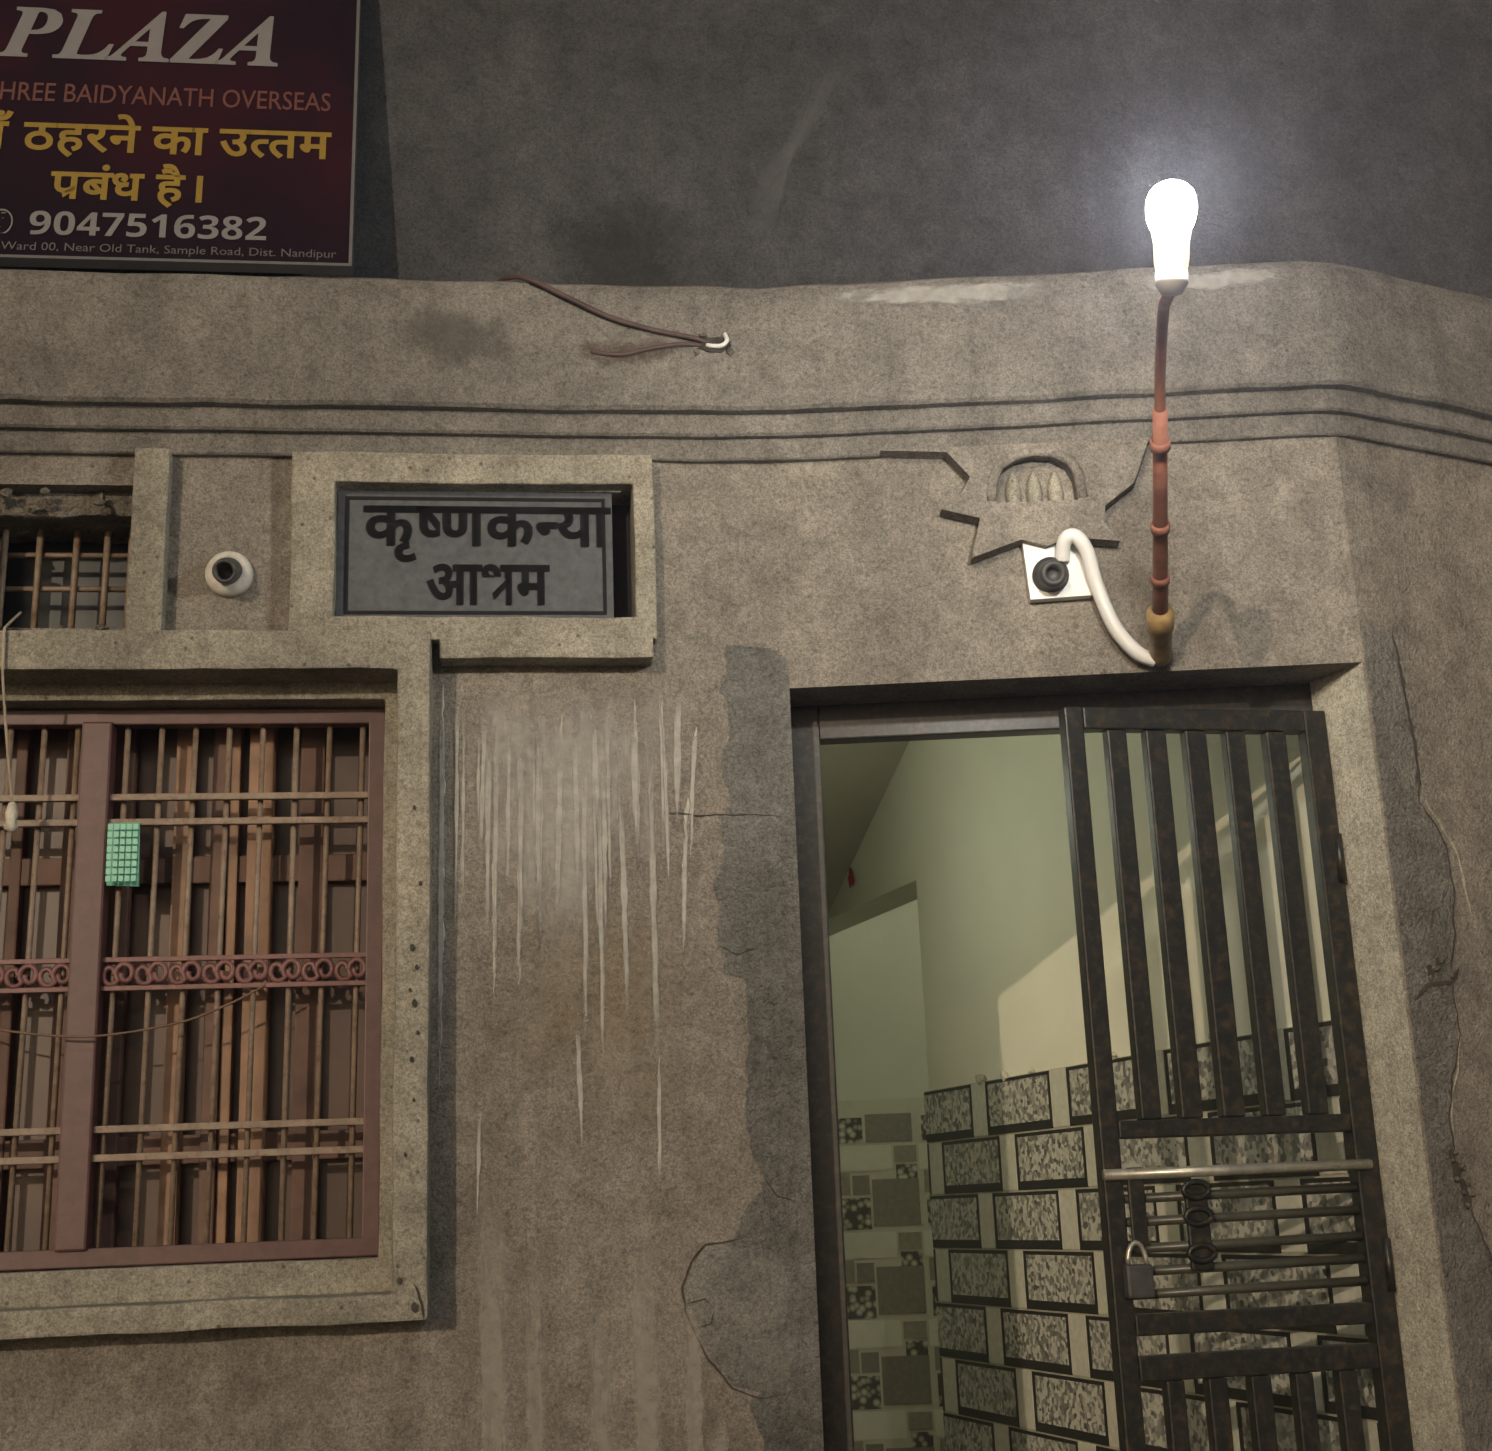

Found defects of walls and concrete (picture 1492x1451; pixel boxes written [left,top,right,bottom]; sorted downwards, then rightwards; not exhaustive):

leakage [438,685,697,1089]
peeling [713,645,824,1451]
crack [1392,632,1492,1262]